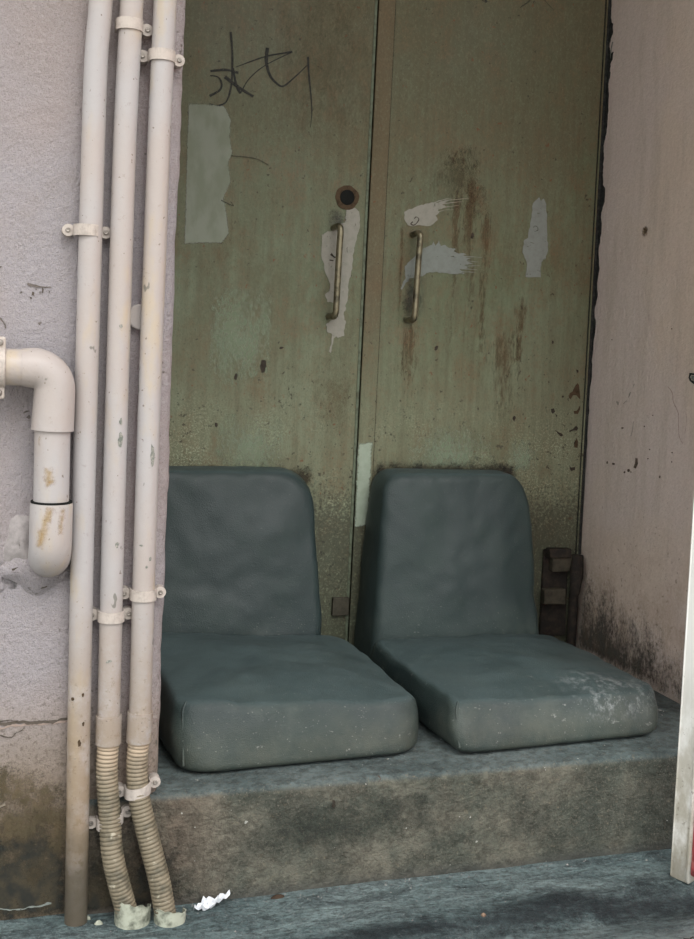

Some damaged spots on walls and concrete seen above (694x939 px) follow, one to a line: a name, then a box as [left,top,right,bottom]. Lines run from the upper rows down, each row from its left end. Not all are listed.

leakage [579,591,679,694]
crack [0,718,67,738]
leakage [0,766,66,921]